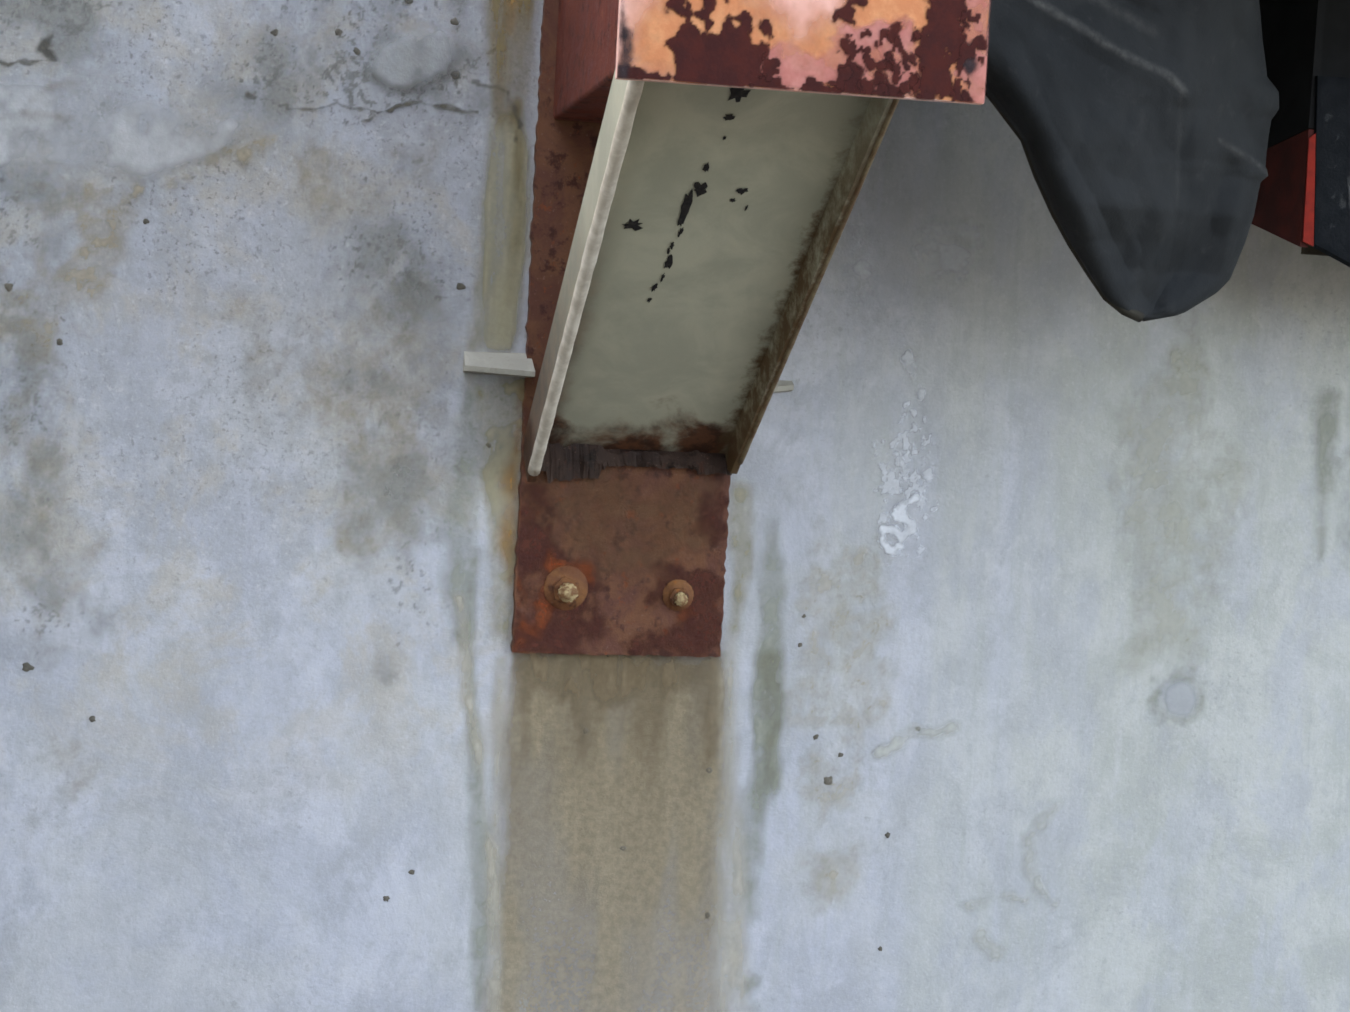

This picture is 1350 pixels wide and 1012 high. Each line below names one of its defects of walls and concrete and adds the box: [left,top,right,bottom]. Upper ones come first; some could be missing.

crack [0,37,55,66]
crack [246,92,313,110]
crack [353,80,522,127]
rust [618,0,988,140]
rust [482,0,534,350]
rust [622,219,643,231]
rust [647,162,709,302]
rust [482,378,603,654]
water stain [873,389,937,555]
rust [630,565,724,656]